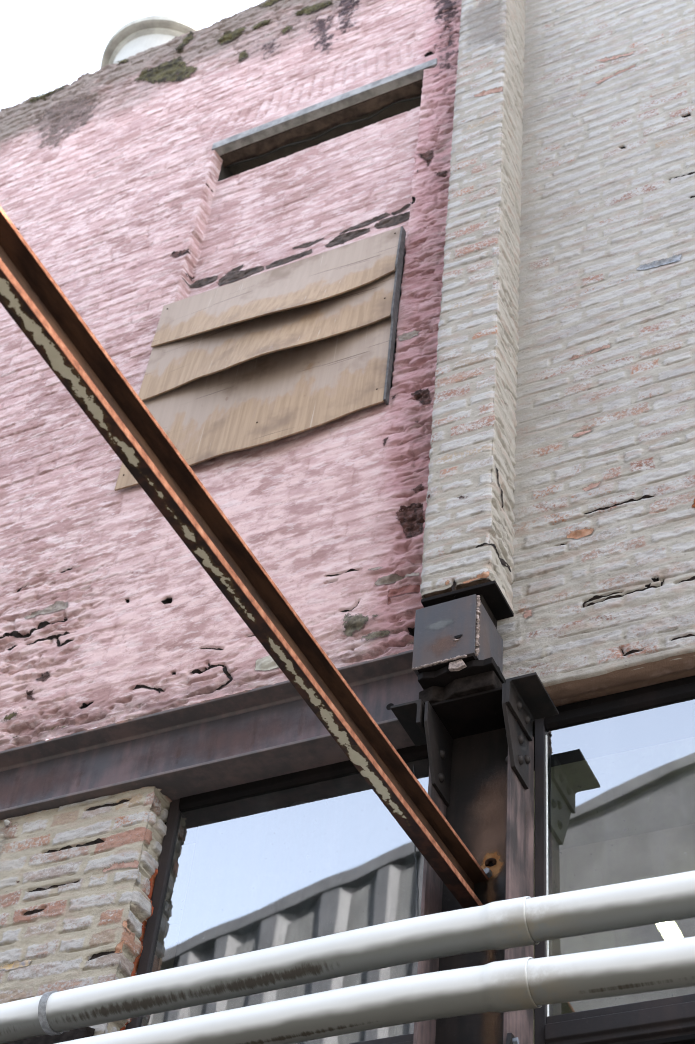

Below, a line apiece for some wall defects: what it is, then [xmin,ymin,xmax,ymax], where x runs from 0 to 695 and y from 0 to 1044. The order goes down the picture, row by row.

damp [309,0,360,54]
damp [431,0,459,76]
crack [0,617,73,647]
crack [133,685,165,693]
crack [191,648,233,691]